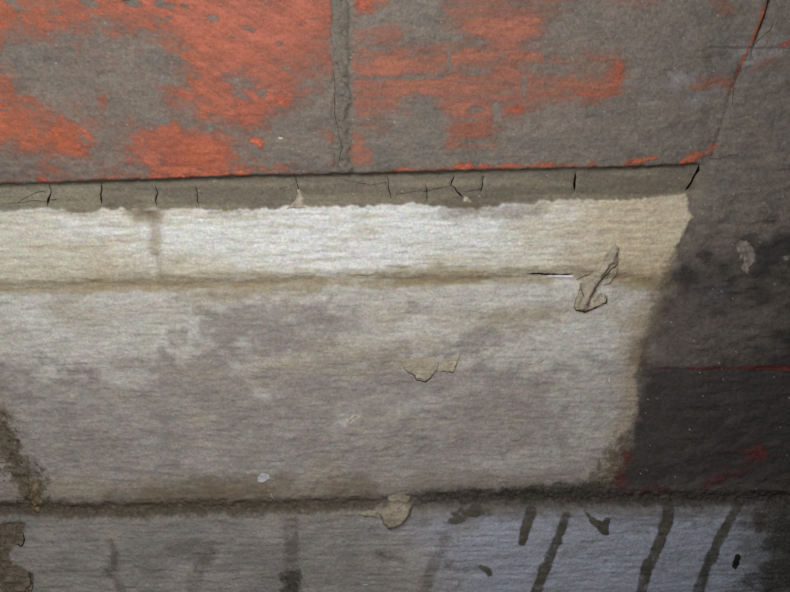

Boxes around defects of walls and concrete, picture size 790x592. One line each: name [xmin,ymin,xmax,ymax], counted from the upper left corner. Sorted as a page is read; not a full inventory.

peeling [0,0,332,156]
peeling [353,0,623,148]
crack [732,0,774,104]
crack [9,184,56,206]
peeling [126,121,267,179]
peeling [438,162,577,170]
peeling [680,144,716,164]
peeling [573,244,620,313]
damp [418,436,790,592]